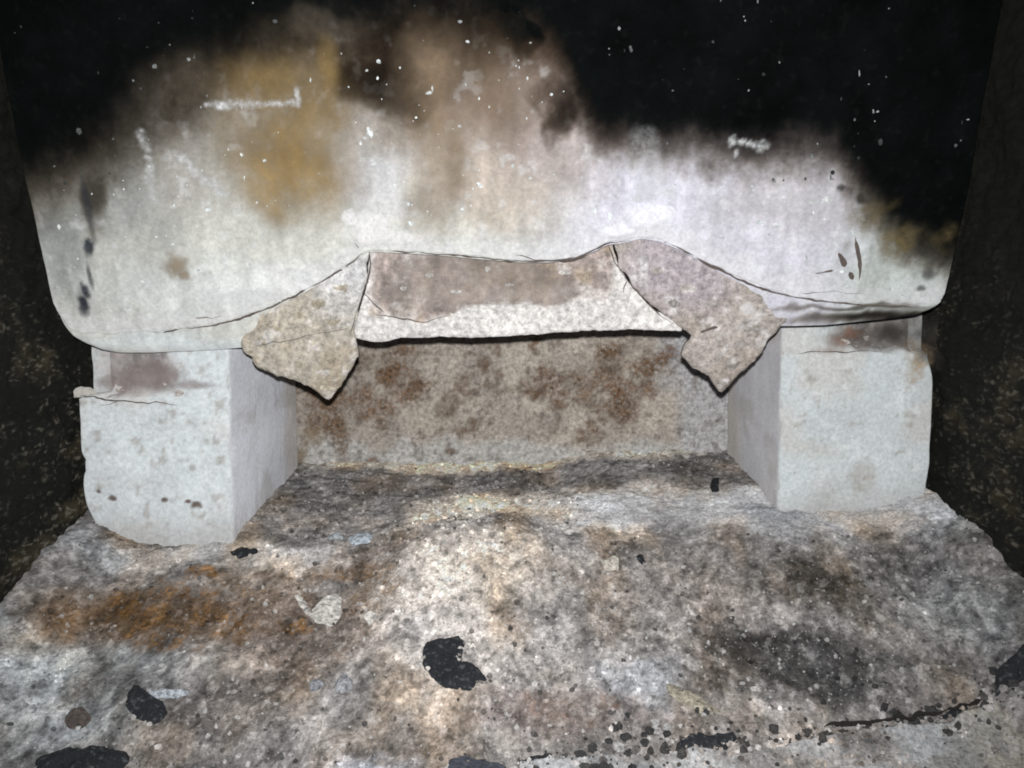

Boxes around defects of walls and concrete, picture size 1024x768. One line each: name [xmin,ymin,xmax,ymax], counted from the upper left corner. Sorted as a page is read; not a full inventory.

peeling [241,252,370,400]
spalling [394,257,571,311]
peeling [614,239,787,392]
crack [84,396,172,405]
rust [307,381,426,453]
rust [527,367,565,409]
rust [576,344,675,422]
crack [824,699,982,727]